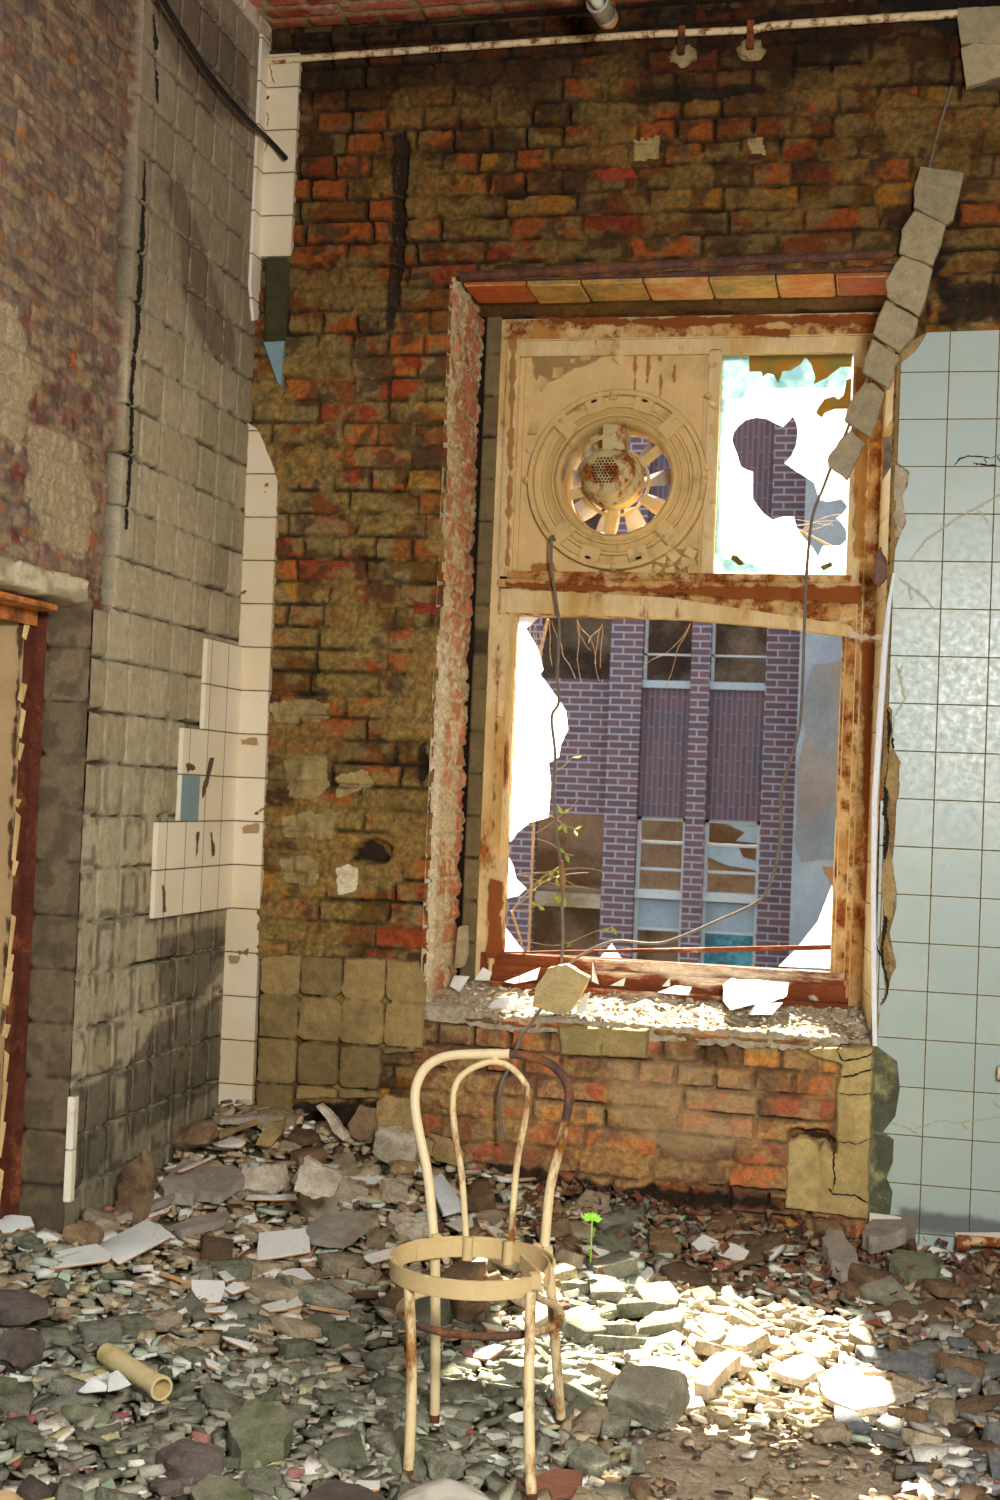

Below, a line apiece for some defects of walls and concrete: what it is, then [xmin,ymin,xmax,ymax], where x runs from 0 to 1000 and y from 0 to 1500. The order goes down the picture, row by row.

spalling [901,333,927,362]
spalling [954,454,1000,466]
rust [861,641,875,958]
crack [837,1044,874,1096]
crack [828,1138,872,1204]